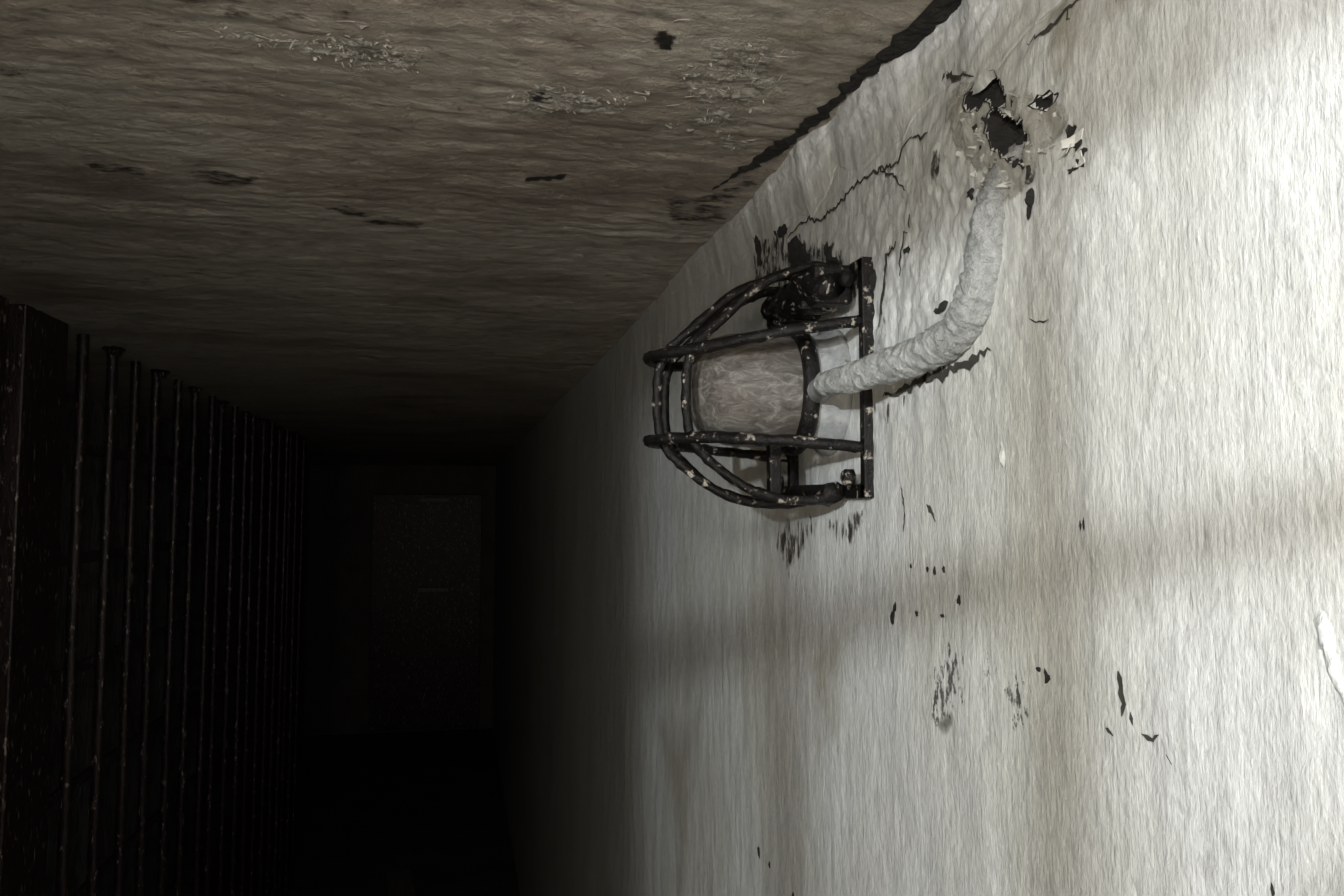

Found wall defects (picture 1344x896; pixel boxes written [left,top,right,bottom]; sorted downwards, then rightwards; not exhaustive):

crack [1026,0,1079,45]
flaking render [945,70,1088,220]
crack [787,132,928,327]